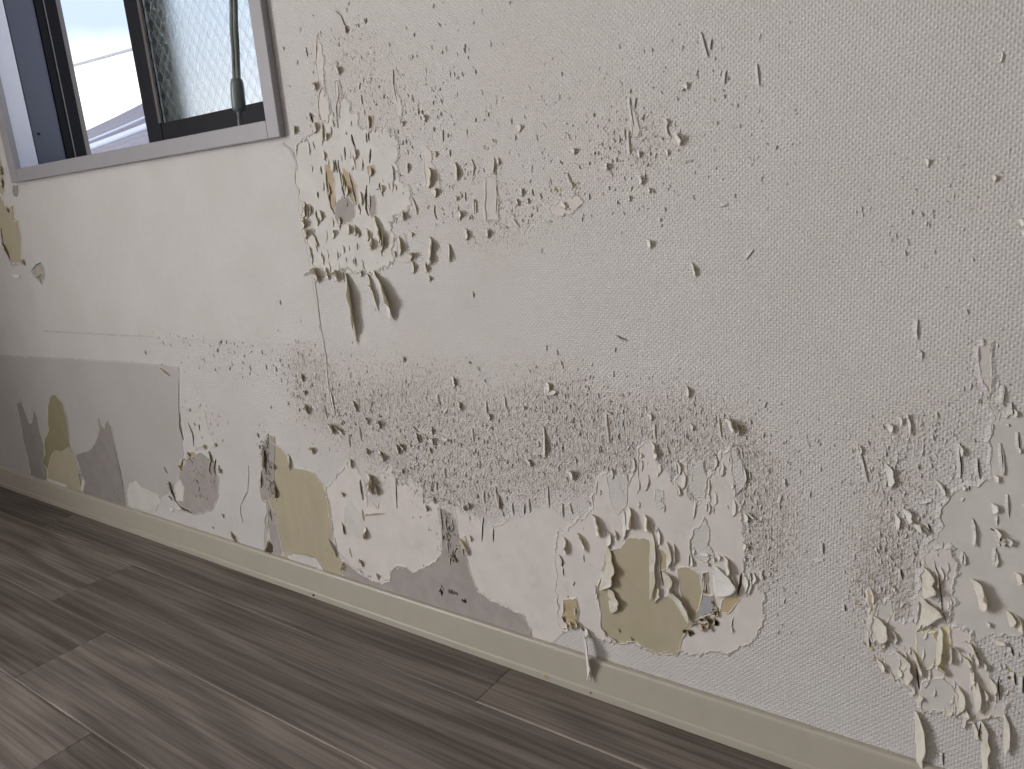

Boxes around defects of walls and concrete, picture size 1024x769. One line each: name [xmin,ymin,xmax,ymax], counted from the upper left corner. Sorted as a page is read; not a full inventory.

peeling [308,112,585,282]
flaking render [17,399,47,480]
flaking render [76,421,126,506]
flaking render [168,443,220,515]
peeling [323,387,493,501]
peeling [885,464,895,489]
flaking render [327,482,532,637]
peeling [591,507,631,548]
peeling [894,508,930,535]
spalling [561,597,585,631]
peeling [870,568,997,720]
peeling [970,578,1006,647]